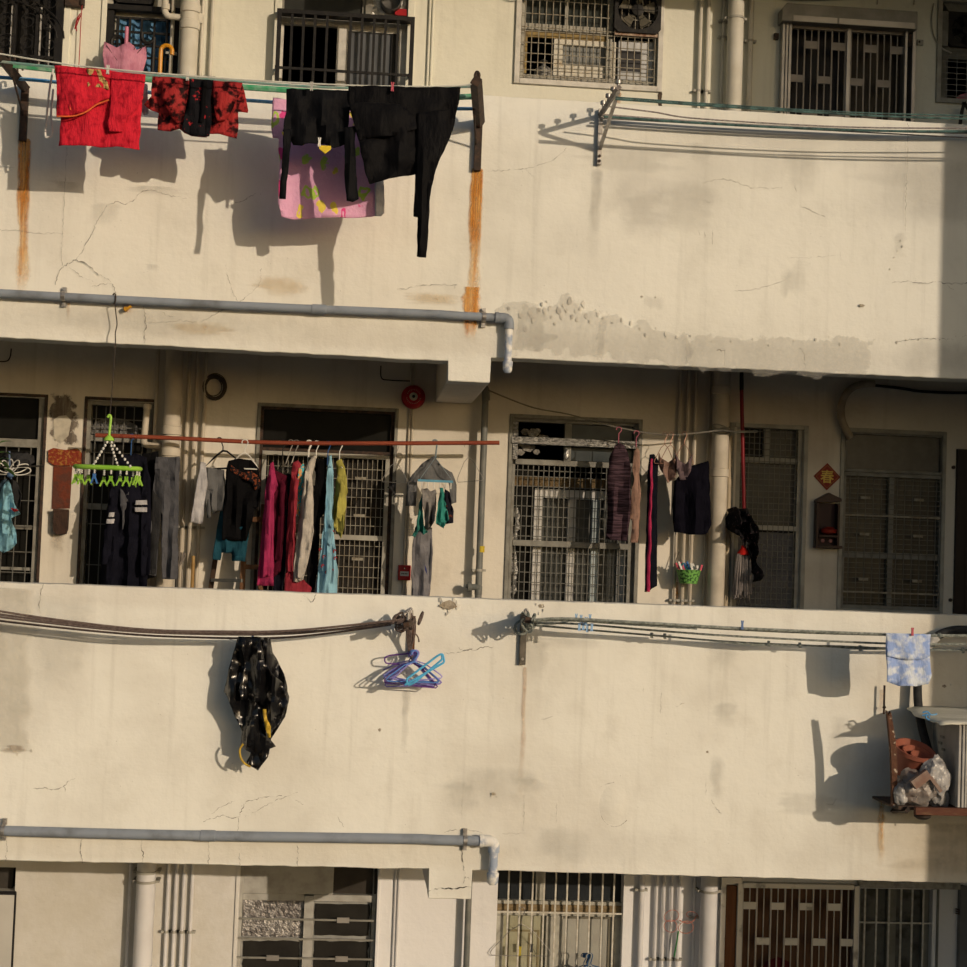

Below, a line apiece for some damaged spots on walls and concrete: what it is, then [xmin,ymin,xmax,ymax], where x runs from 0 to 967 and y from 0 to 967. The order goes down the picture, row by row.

rust [18,139,31,274]
crack [8,178,175,293]
rust [463,169,483,325]